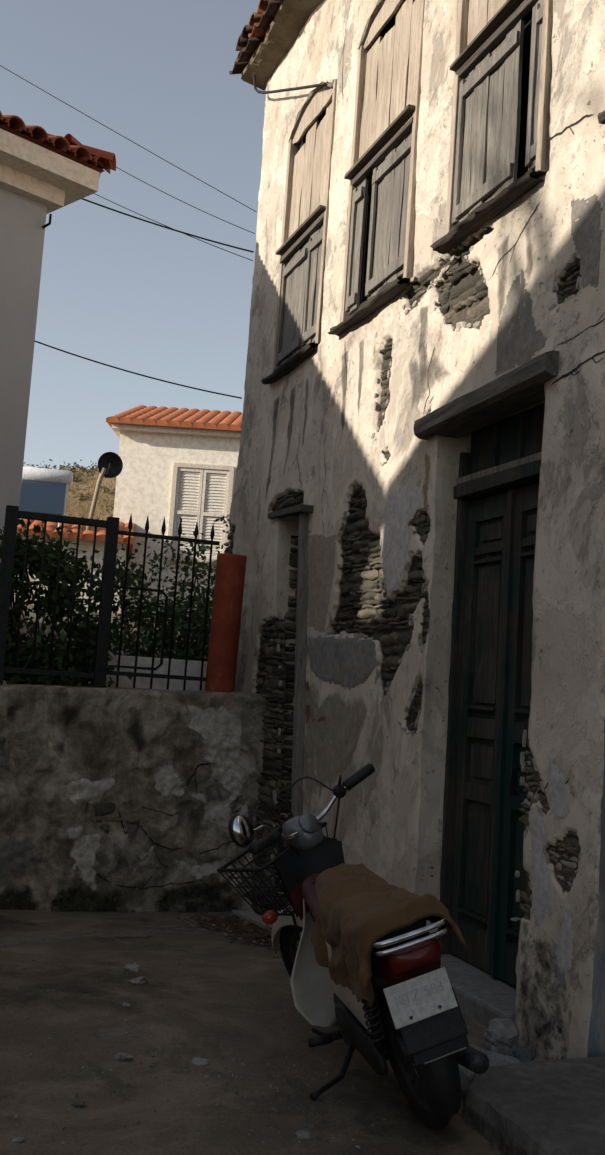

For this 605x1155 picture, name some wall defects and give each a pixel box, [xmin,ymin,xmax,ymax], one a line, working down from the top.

flaking render [371,342,392,439]
flaking render [398,225,547,376]
flaking render [548,194,602,310]
crack [552,312,605,384]
flaking render [153,485,431,913]
leakage [0,886,37,923]
leakage [51,888,135,913]
flaking render [65,777,144,890]
crack [96,762,233,890]
leakage [159,881,236,913]
peeling [510,730,582,990]
mould [517,941,565,1060]